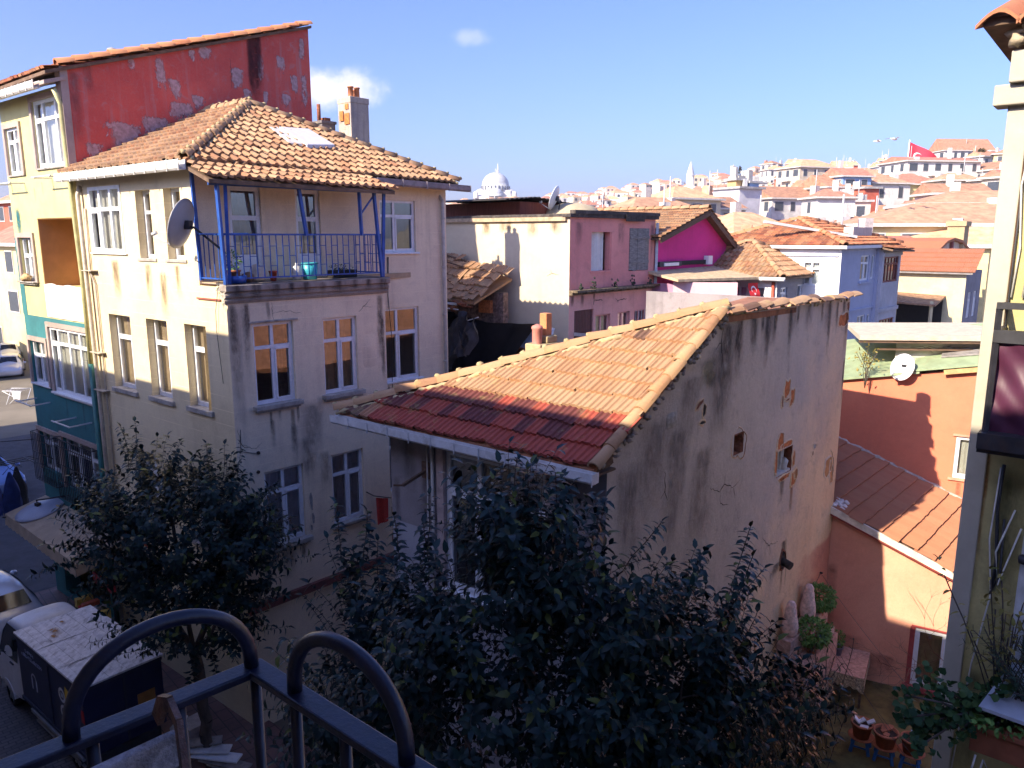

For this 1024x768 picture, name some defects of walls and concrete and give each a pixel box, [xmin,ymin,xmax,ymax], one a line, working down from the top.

peeling [189,47,211,62]
peeling [231,55,308,108]
peeling [87,58,204,156]
leakage [722,315,777,362]
spalling [695,397,707,427]
spalling [780,378,795,409]
spalling [774,431,798,489]